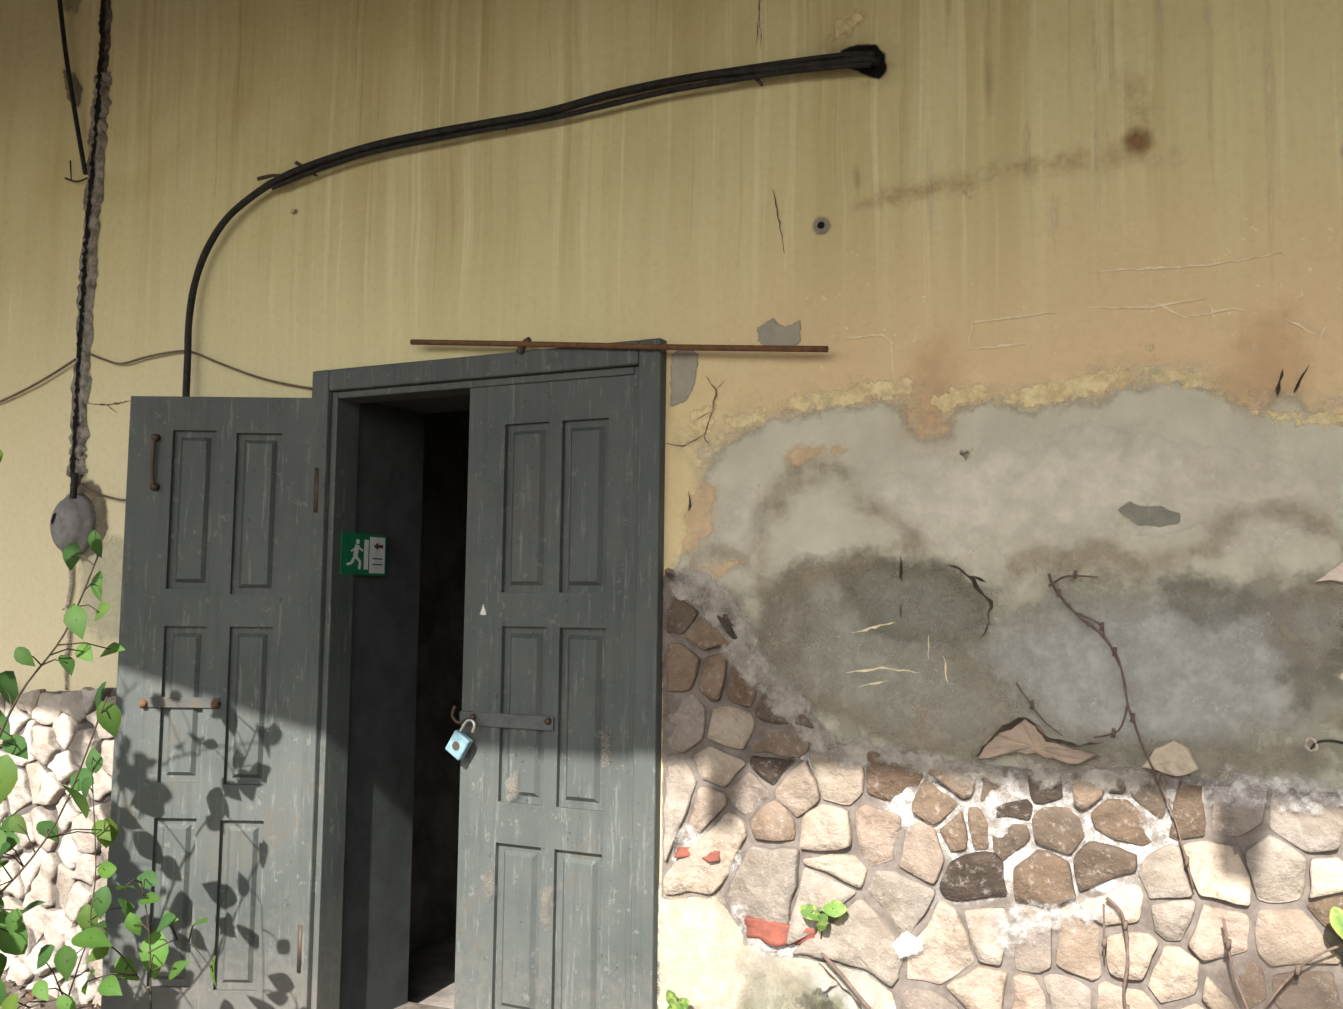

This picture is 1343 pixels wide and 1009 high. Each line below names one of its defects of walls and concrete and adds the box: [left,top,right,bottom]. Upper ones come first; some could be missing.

crack [755,0,763,49]
rust [1128,133,1148,151]
spalling [757,318,801,346]
flaking render [670,350,1343,793]